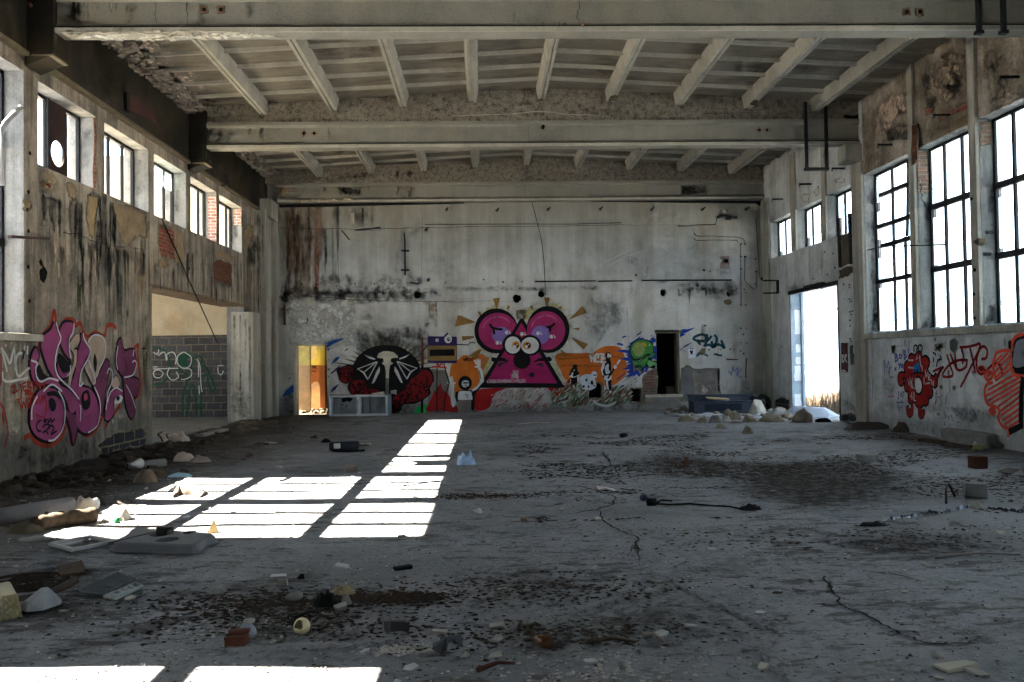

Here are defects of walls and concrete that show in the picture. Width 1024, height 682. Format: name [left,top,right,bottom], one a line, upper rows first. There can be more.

spalling [61,29,240,114]
spalling [911,61,993,194]
spalling [234,151,279,177]
water stain [43,199,174,316]
spalling [113,202,185,268]
spalling [212,259,232,287]
water stain [683,284,737,300]
crack [530,451,640,561]
crack [821,576,980,645]